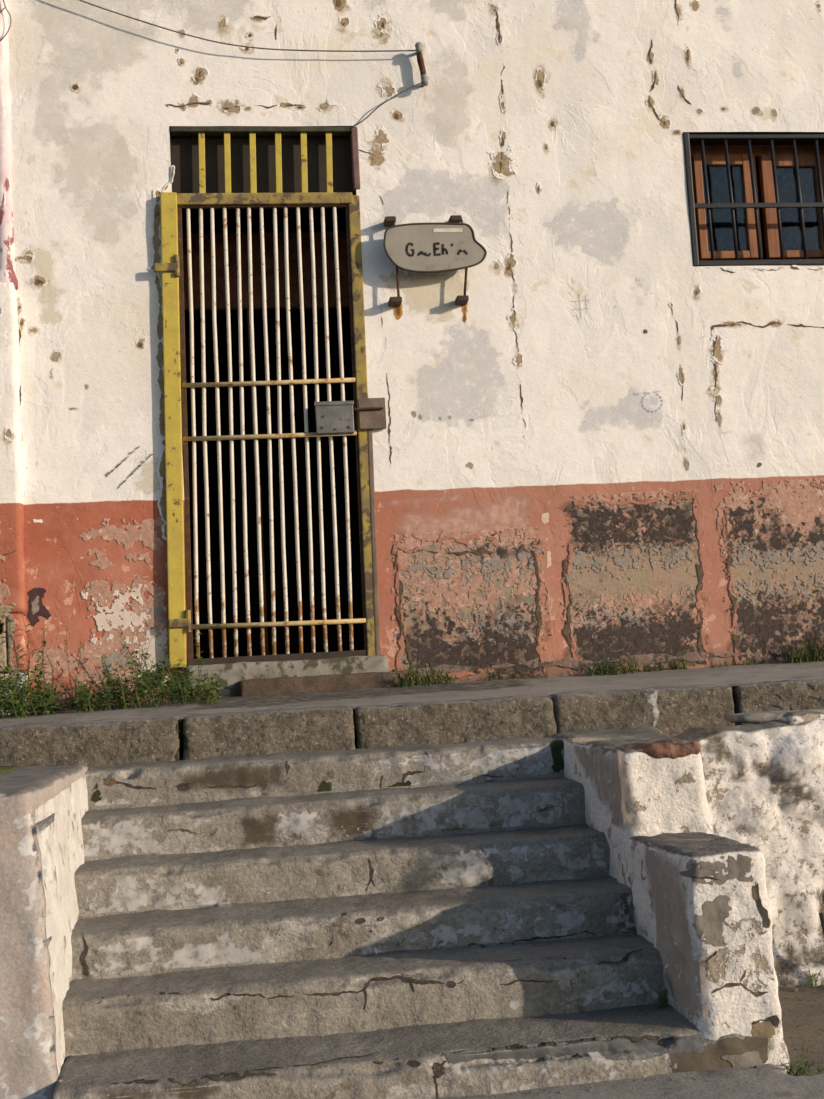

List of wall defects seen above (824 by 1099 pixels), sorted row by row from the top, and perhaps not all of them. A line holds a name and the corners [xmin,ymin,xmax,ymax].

crack [673,0,681,20]
crack [645,40,692,135]
peeling [0,165,175,697]
crack [669,302,824,470]
peeling [388,490,709,681]
peeling [714,478,824,665]
peeling [679,854,753,947]
crack [80,935,89,976]
crack [160,975,464,1010]
crack [114,1048,446,1098]